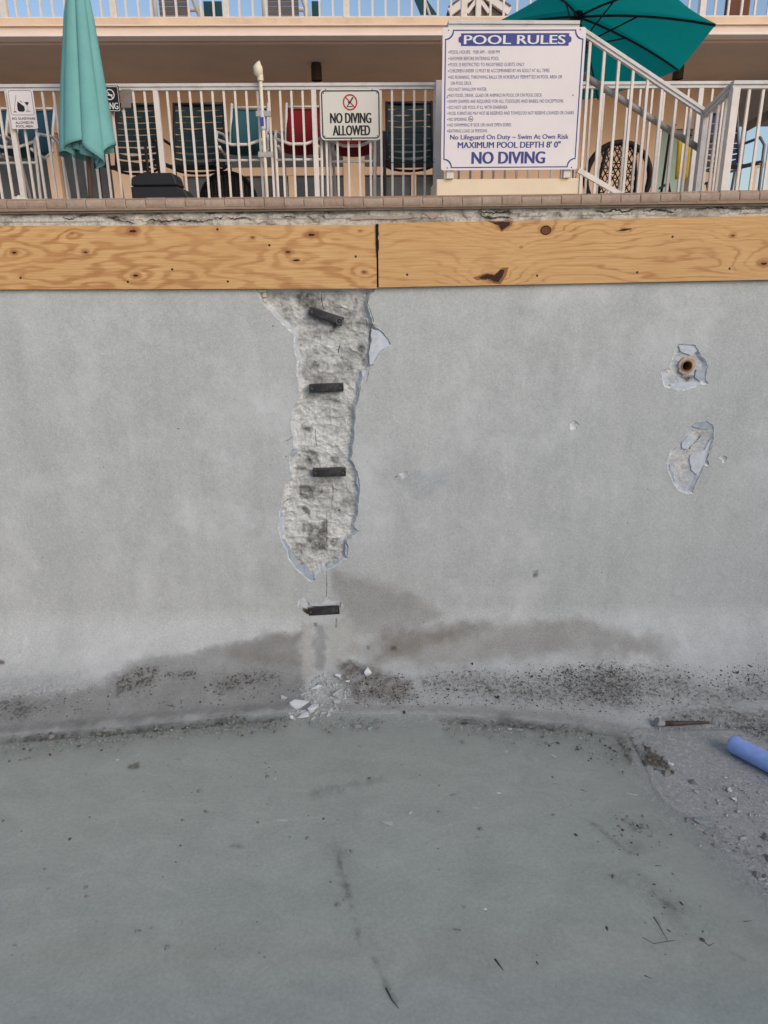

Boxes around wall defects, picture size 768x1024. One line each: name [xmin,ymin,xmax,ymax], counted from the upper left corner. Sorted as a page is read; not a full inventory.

spalling [660,343,711,392]
spalling [254,287,392,582]
spalling [666,420,728,495]
spalling [297,596,349,610]